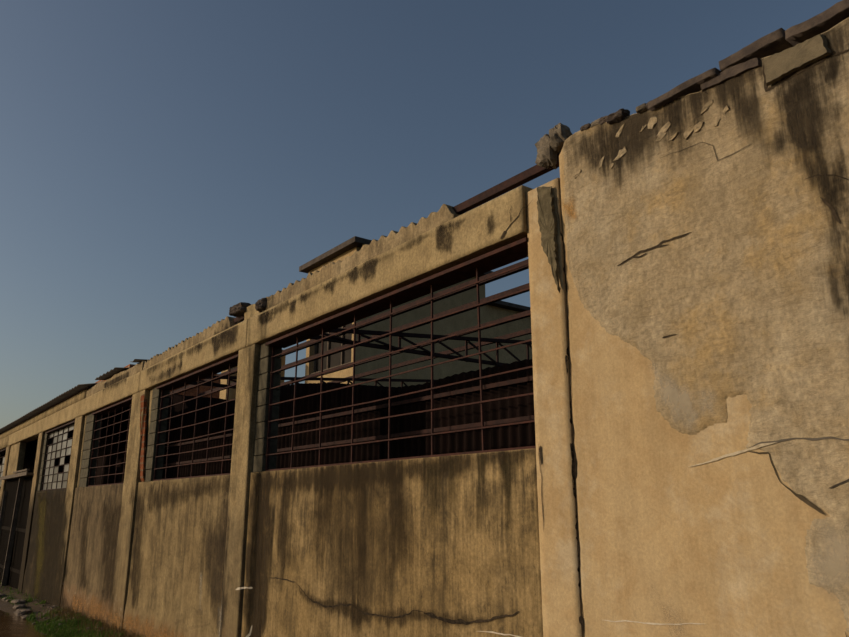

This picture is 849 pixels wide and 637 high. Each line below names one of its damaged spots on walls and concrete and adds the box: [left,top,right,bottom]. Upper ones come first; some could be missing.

damp [579,66,762,183]
damp [771,27,849,222]
damp [349,261,377,281]
damp [436,221,462,251]
crack [617,232,691,266]
damp [212,320,240,355]
peeling [537,17,849,633]
crack [555,187,584,637]
crack [688,436,849,516]
damp [102,500,121,606]
damp [244,450,532,637]
crack [269,577,519,625]